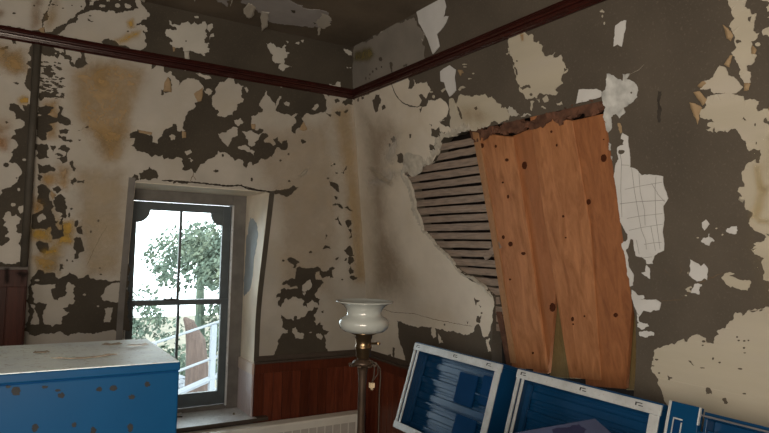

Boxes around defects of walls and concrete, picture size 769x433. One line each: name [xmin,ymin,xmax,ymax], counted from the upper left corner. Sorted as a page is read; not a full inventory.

peeling [0,0,150,50]
peeling [689,0,769,281]
flaking render [0,38,130,336]
crack [162,172,298,193]
peeling [130,0,612,366]
peeling [621,238,650,286]
peeling [685,260,708,296]
peeling [721,272,751,291]
peeling [637,314,654,338]
spalling [598,387,634,396]
peeling [651,307,769,432]